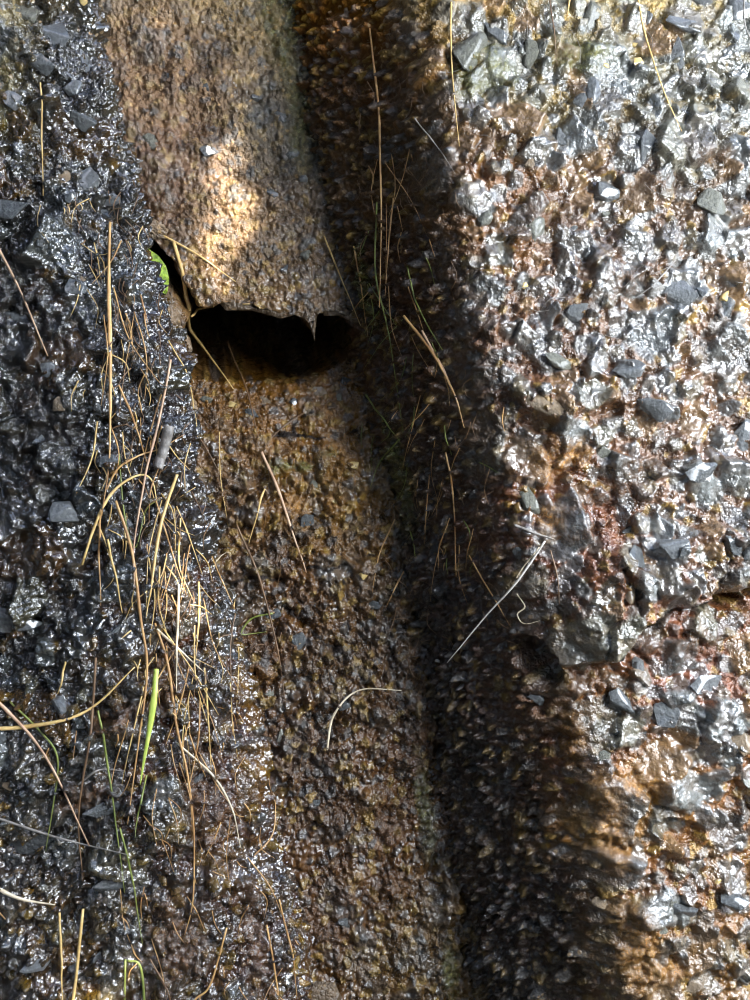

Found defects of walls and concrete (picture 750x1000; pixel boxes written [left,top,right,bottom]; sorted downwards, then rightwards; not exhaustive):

crack [622,567,671,628]
crack [697,554,732,607]
leakage [455,794,532,1000]